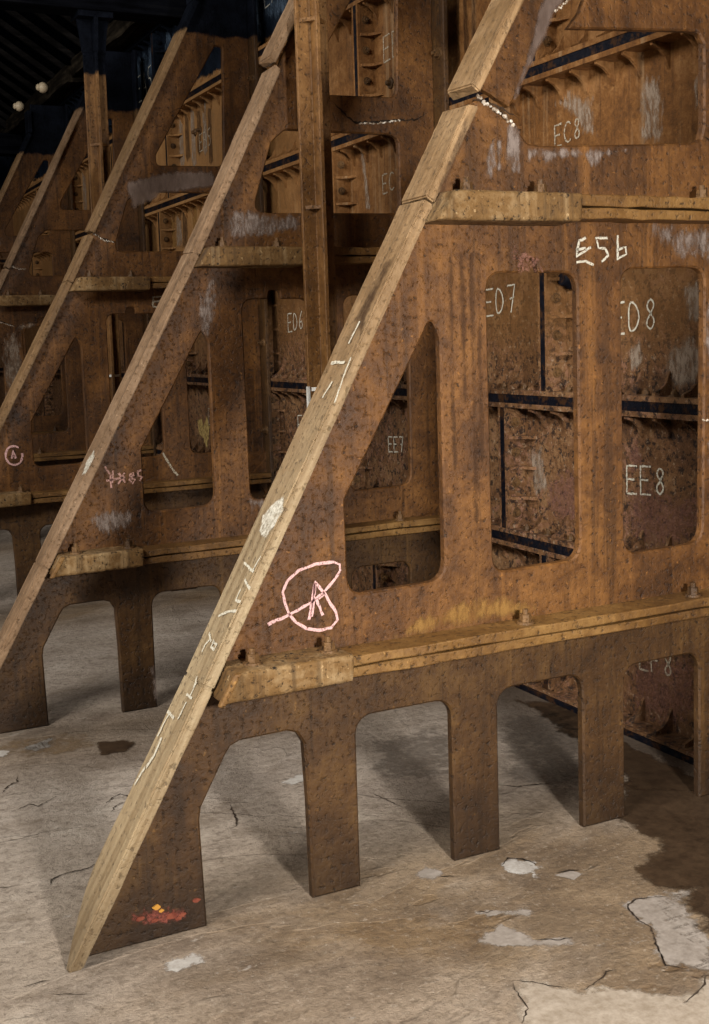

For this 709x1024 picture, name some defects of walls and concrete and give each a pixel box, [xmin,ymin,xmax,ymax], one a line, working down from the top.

leakage [0,735,135,755]
leakage [618,742,709,931]
spalling [502,857,537,878]
spalling [475,909,573,946]
spalling [513,891,709,1024]
crack [512,969,616,990]